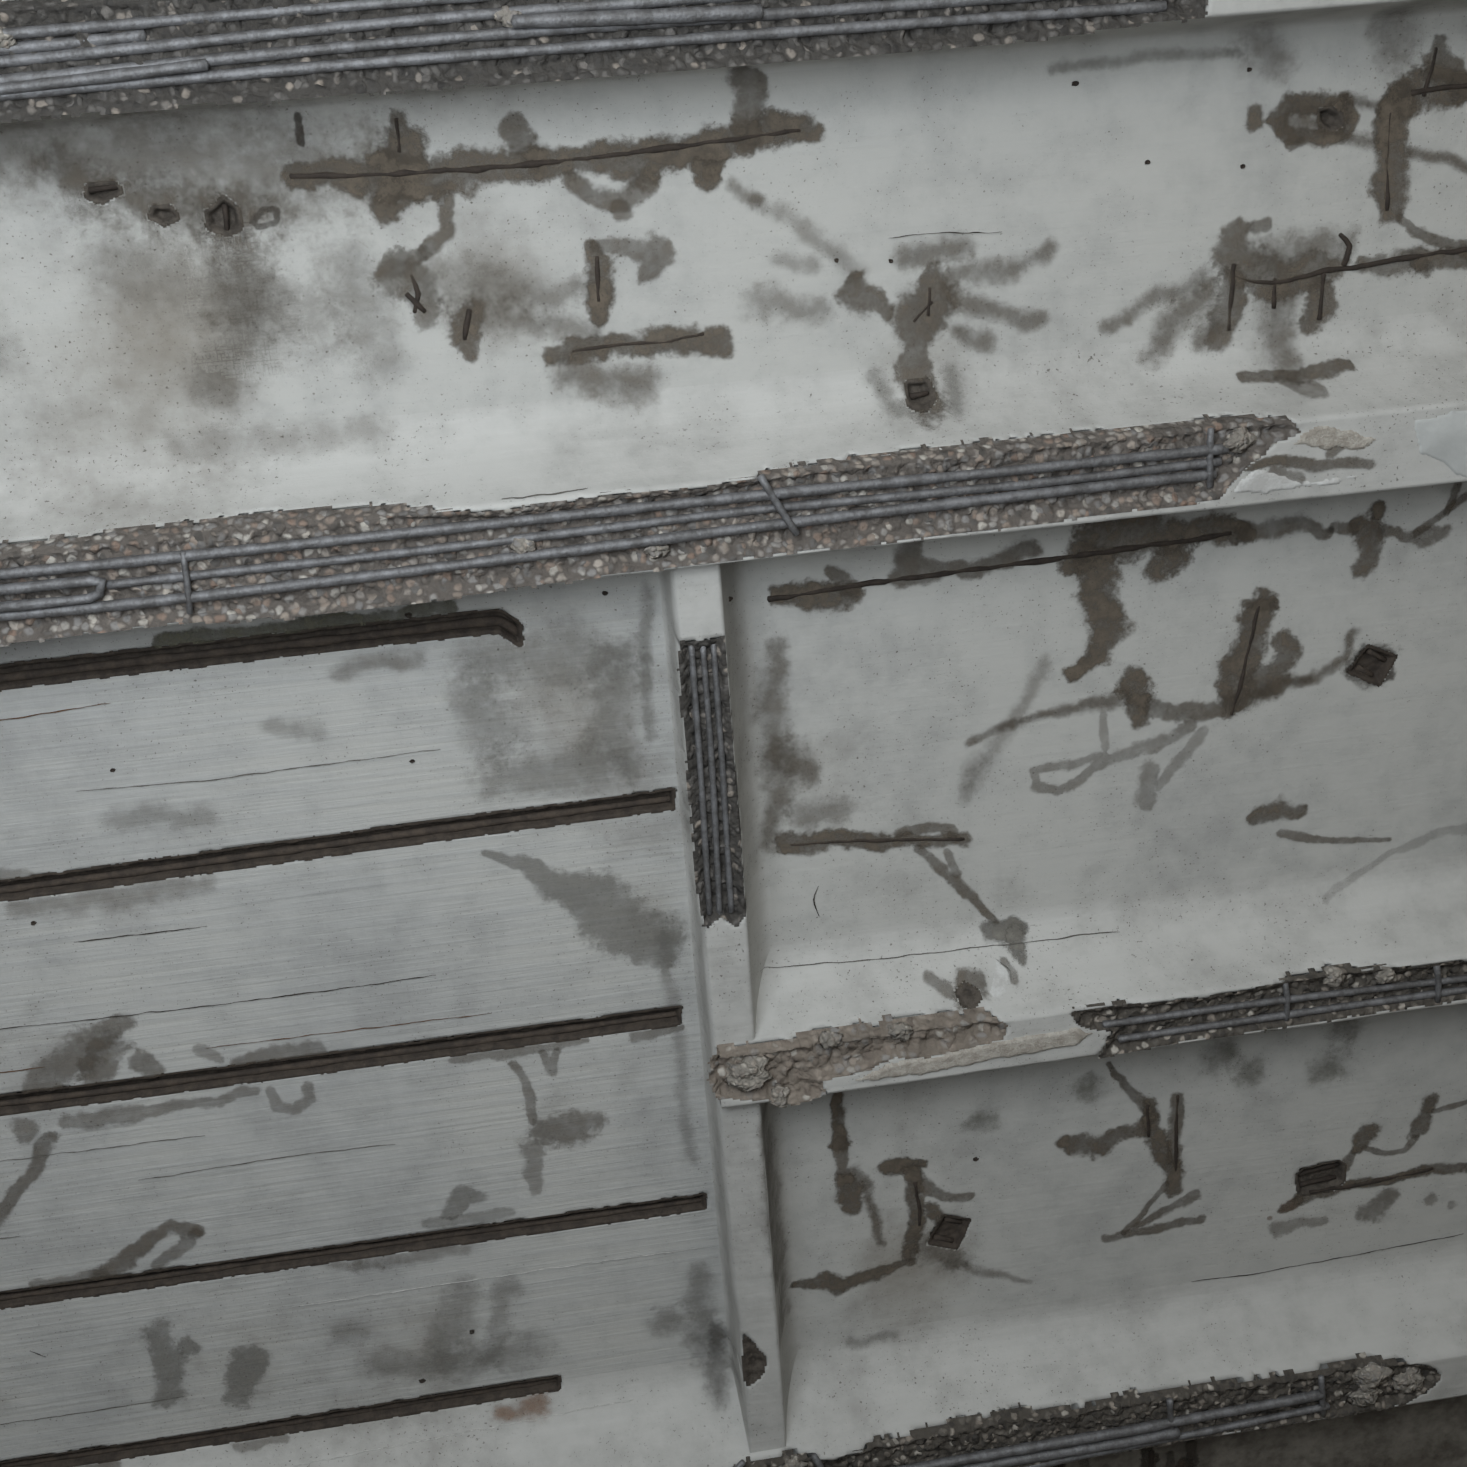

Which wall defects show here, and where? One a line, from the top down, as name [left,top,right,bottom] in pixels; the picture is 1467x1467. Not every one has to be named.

spalling [0,0,1208,123]
water stain [419,190,454,258]
crack [893,230,1002,238]
spalling [0,414,1376,647]
spalling [677,635,746,928]
crack [761,932,1111,971]
crack [0,975,432,1030]
crack [211,1013,490,1048]
spalling [707,960,1467,1108]
crack [3,1135,394,1180]
spalling [734,1352,1441,1467]